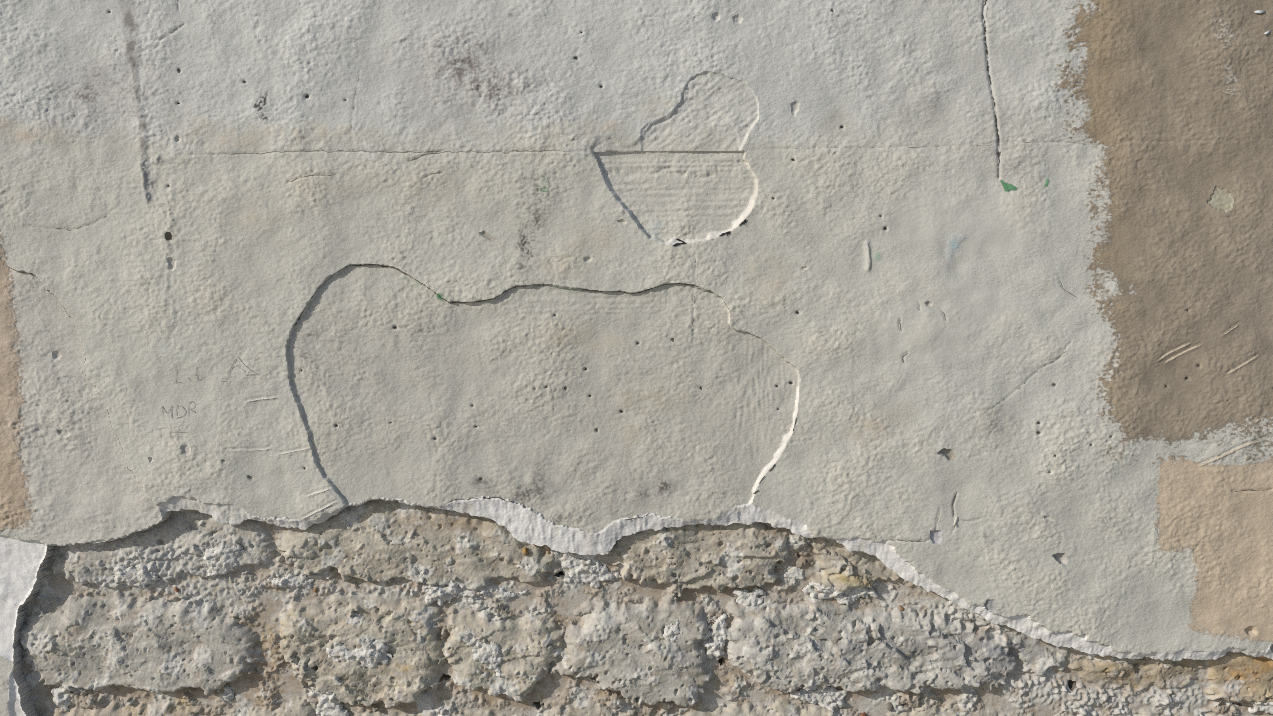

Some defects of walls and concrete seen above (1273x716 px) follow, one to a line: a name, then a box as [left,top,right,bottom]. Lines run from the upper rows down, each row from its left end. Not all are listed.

peeling [1211,18,1241,95]
peeling [589,71,759,246]
peeling [1207,186,1234,213]
peeling [0,262,1273,716]